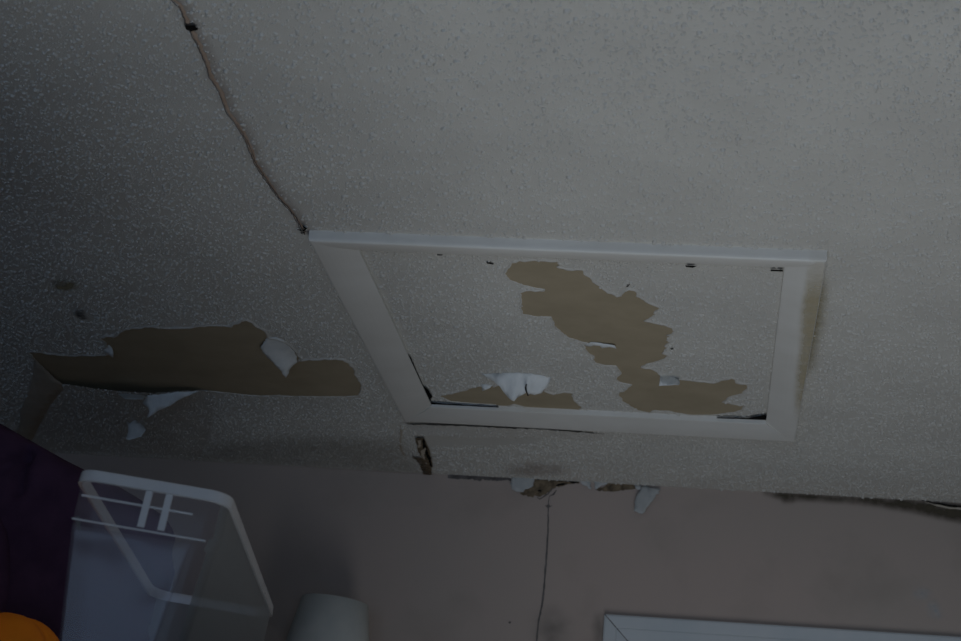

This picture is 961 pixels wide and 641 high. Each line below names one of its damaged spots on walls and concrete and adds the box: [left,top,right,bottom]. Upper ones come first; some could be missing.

crack [171,0,307,235]
peeling [17,319,364,457]
crack [399,424,610,475]
peeling [438,372,584,410]
crack [536,488,557,641]
spalling [448,475,661,514]
peeling [503,259,749,416]
water stain [775,493,961,520]